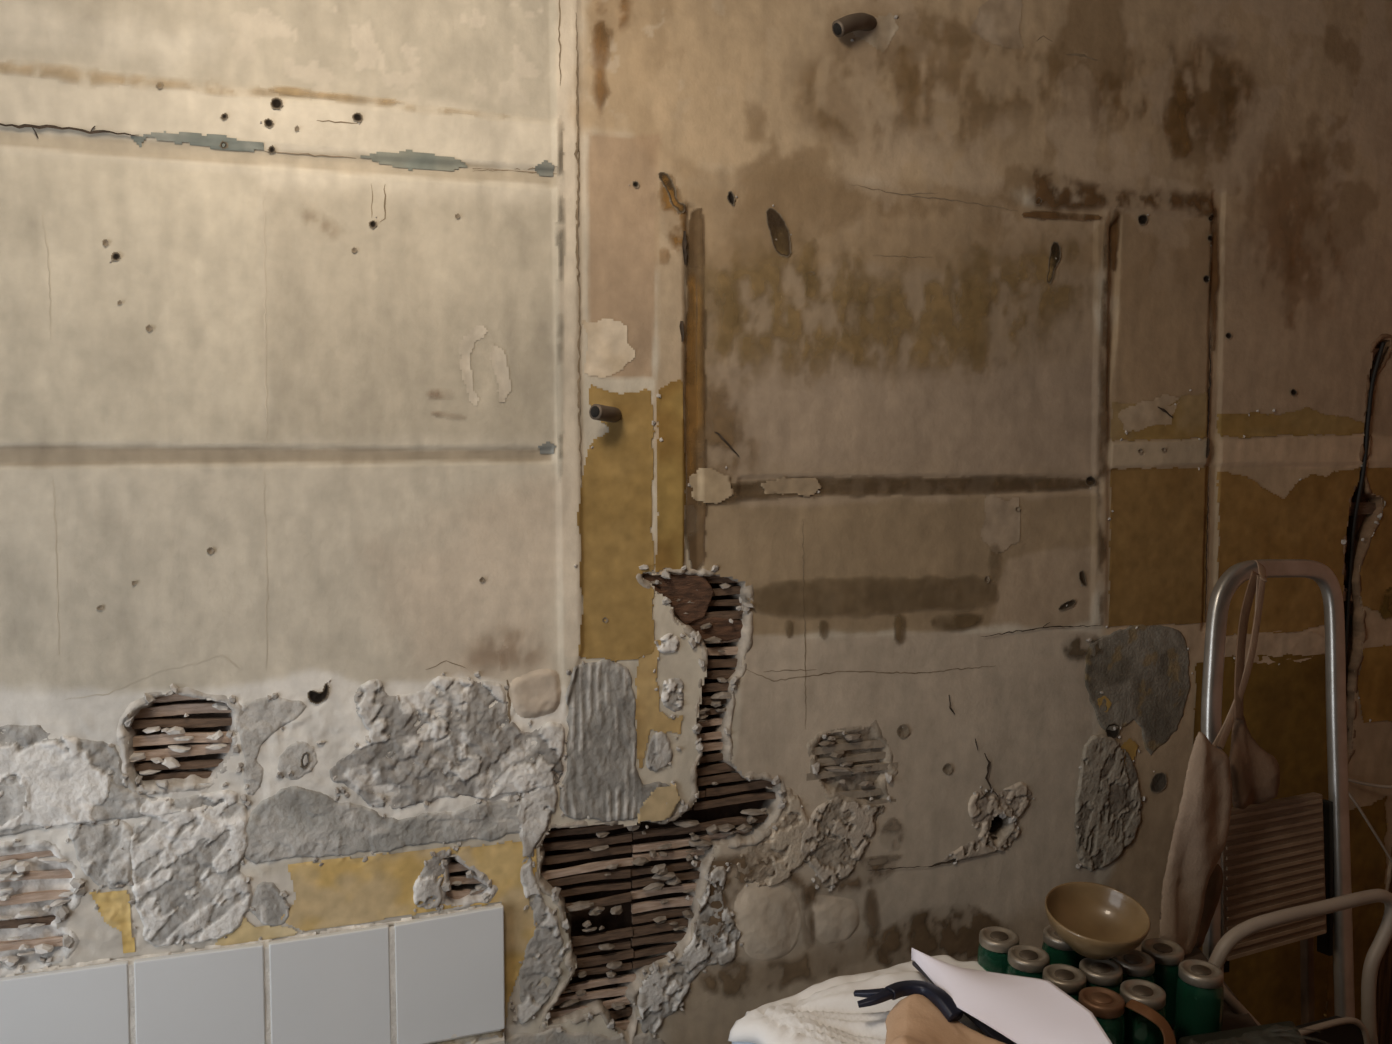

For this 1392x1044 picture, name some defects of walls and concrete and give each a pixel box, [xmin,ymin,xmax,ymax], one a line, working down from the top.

leakage [1166,58,1251,155]
leakage [705,251,1072,370]
peeling [1074,334,1392,872]
spalling [0,380,892,1044]
spalling [943,782,1035,865]
peeling [1349,796,1392,1021]
peeling [1224,936,1335,1026]